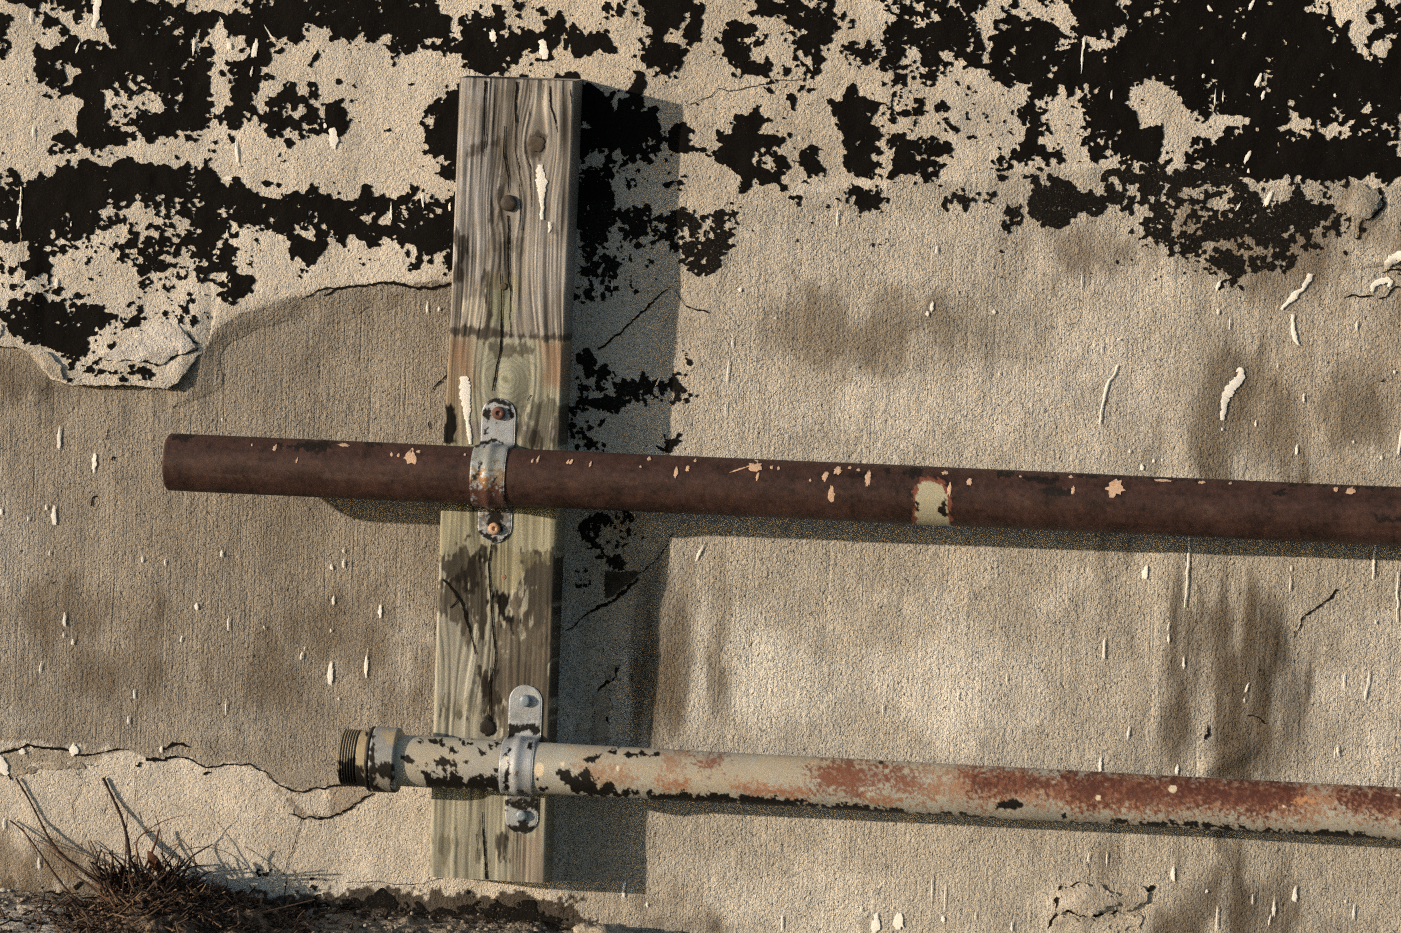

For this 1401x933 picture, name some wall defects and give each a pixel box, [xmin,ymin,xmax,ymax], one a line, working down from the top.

peeling [0,0,1401,389]
crack [1343,187,1386,255]
crack [598,287,710,350]
crack [1345,268,1401,299]
peeling [568,348,698,453]
leakage [621,585,686,741]
leakage [1164,585,1280,780]
crack [0,742,373,902]
crack [1048,863,1117,929]
leakage [1153,861,1253,933]